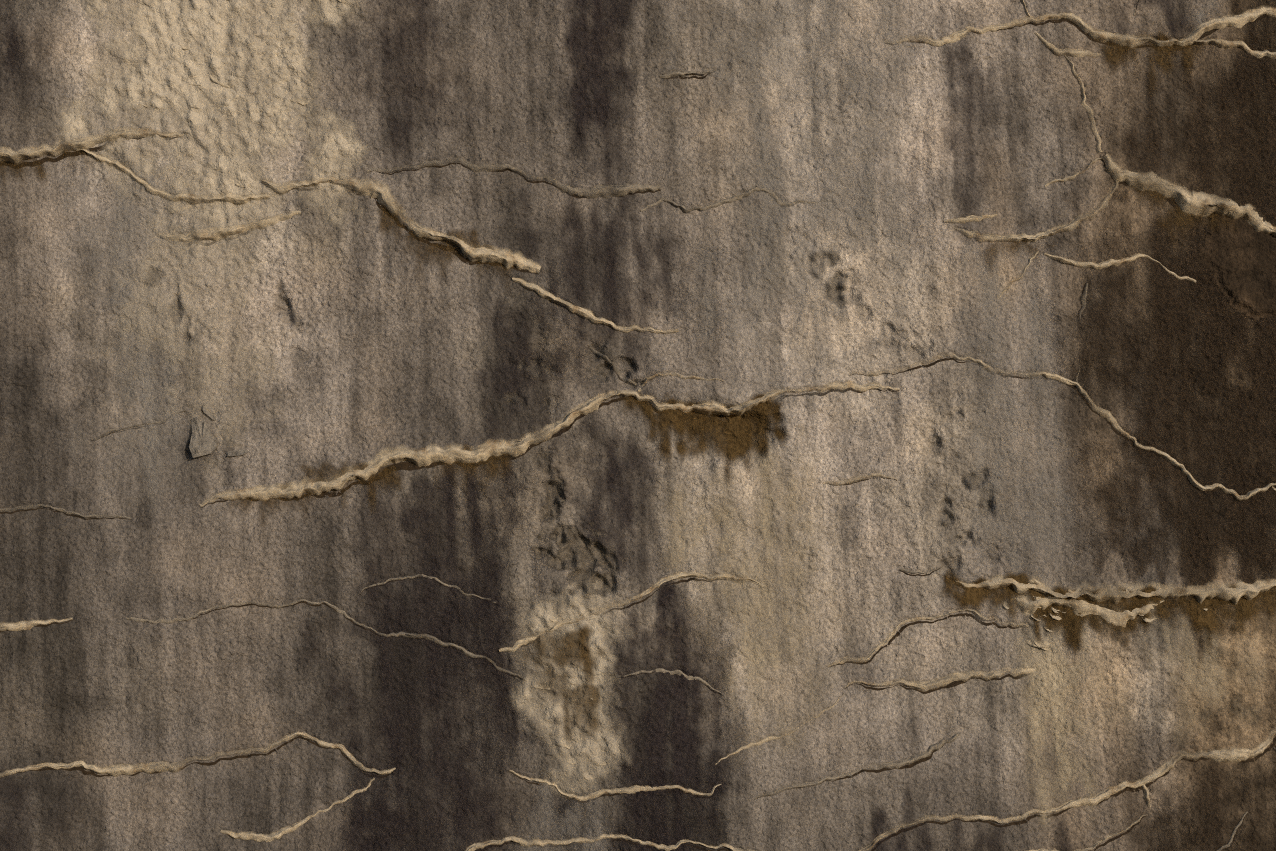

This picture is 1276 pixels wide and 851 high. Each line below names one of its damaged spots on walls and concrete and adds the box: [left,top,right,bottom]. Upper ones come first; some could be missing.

leakage [566,0,634,142]
crack [885,0,1276,237]
crack [0,128,1276,508]
leakage [1142,0,1276,584]
peeling [189,405,248,459]
leakage [584,440,649,567]
crack [0,732,396,842]
leakage [345,468,509,851]
leakage [611,582,725,851]
peeling [1002,593,1074,651]
crack [815,565,1276,718]
crack [860,728,1276,851]